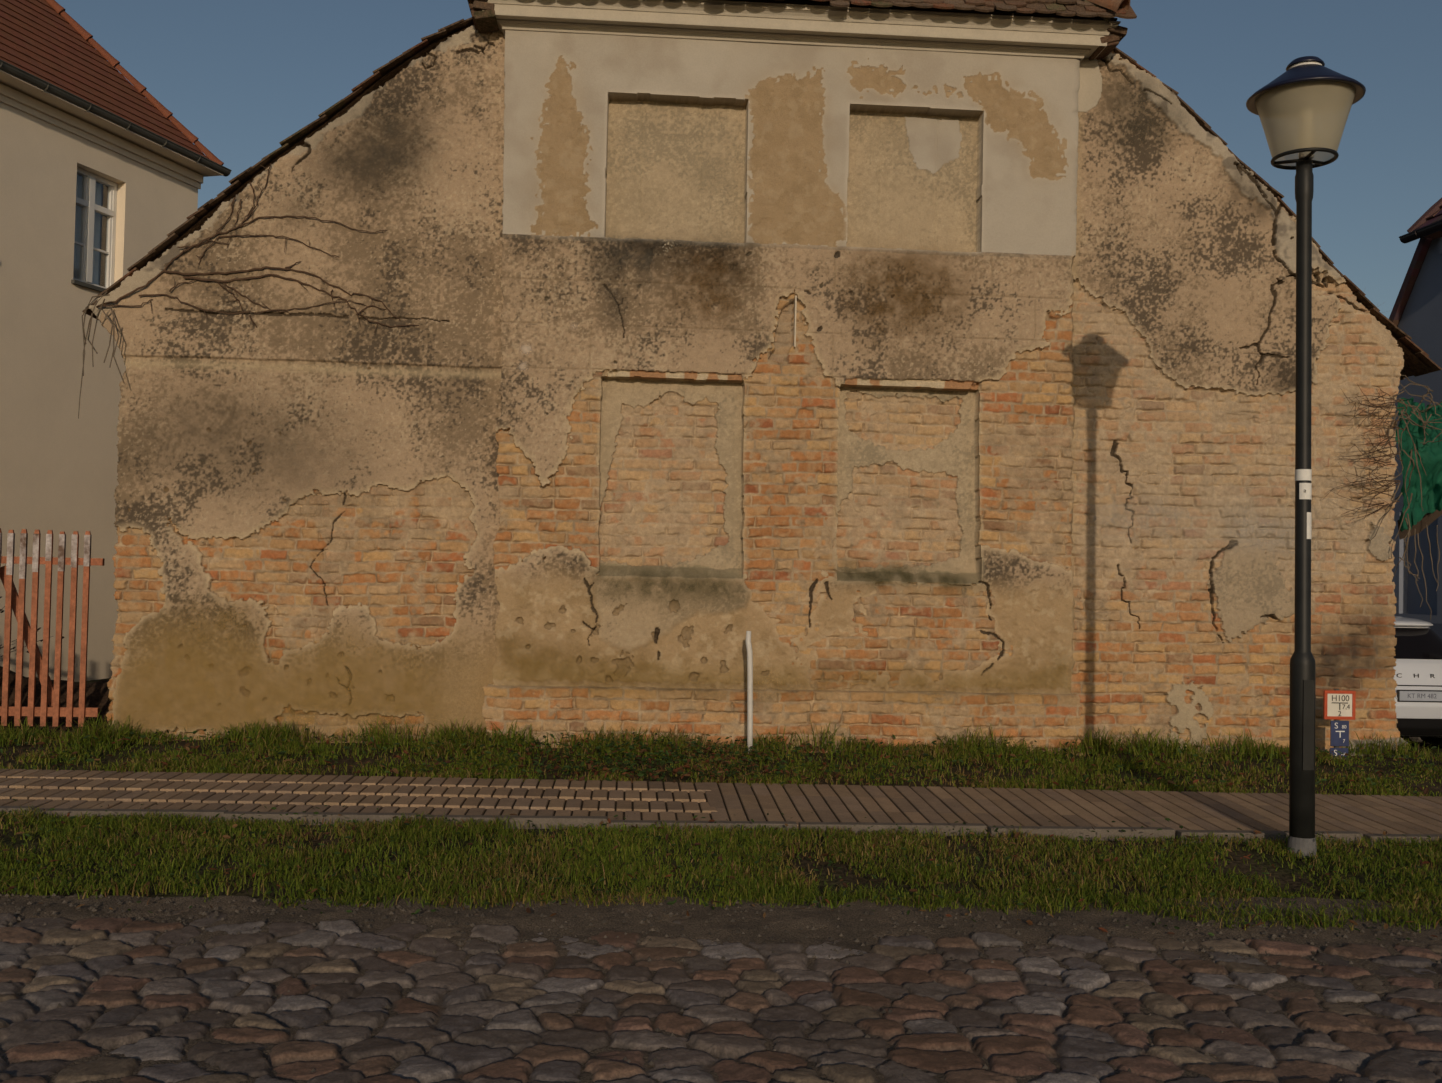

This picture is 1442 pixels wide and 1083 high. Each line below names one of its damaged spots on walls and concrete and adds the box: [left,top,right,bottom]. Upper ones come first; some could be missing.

flaking render [530,55,599,237]
flaking render [745,66,848,258]
flaking render [847,58,1069,180]
crack [1233,161,1367,385]
peeling [0,533,92,579]
flaking render [106,523,168,730]
flaking render [154,242,1408,759]